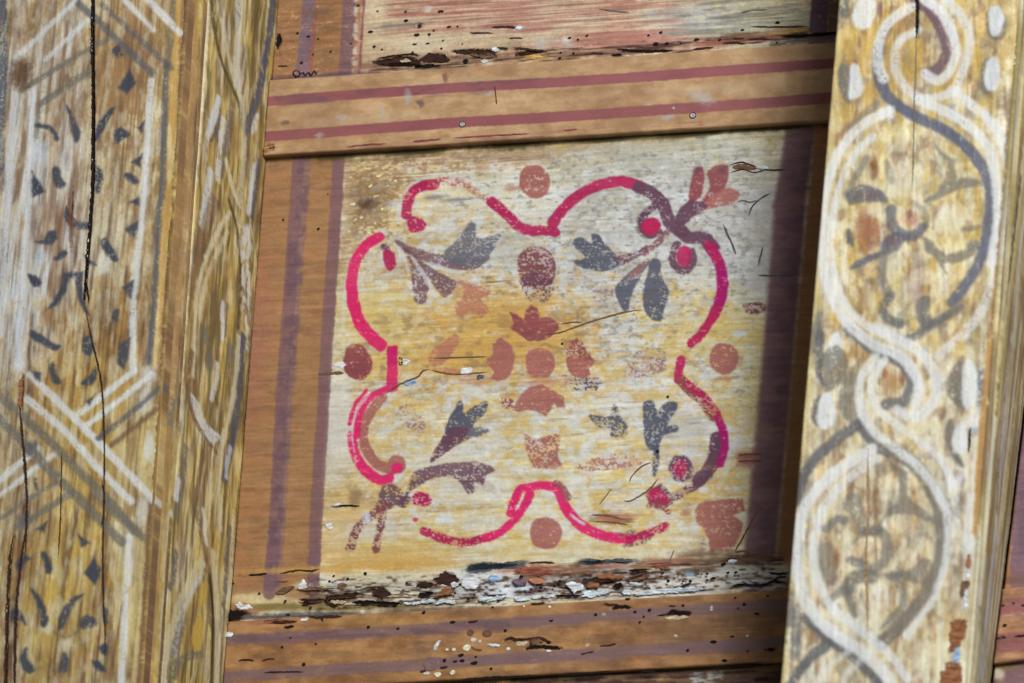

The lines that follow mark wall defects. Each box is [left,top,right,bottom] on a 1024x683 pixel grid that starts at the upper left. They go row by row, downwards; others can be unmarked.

spalling [372,47,499,69]
spalling [515,50,543,60]
crack [911,0,919,183]
peeling [730,161,784,173]
crack [84,0,106,659]
crack [547,310,637,335]
crack [320,369,343,377]
crack [387,356,488,393]
spalling [325,583,359,604]
spalling [372,587,391,597]
flaking render [403,571,554,605]
flaking render [566,573,706,598]